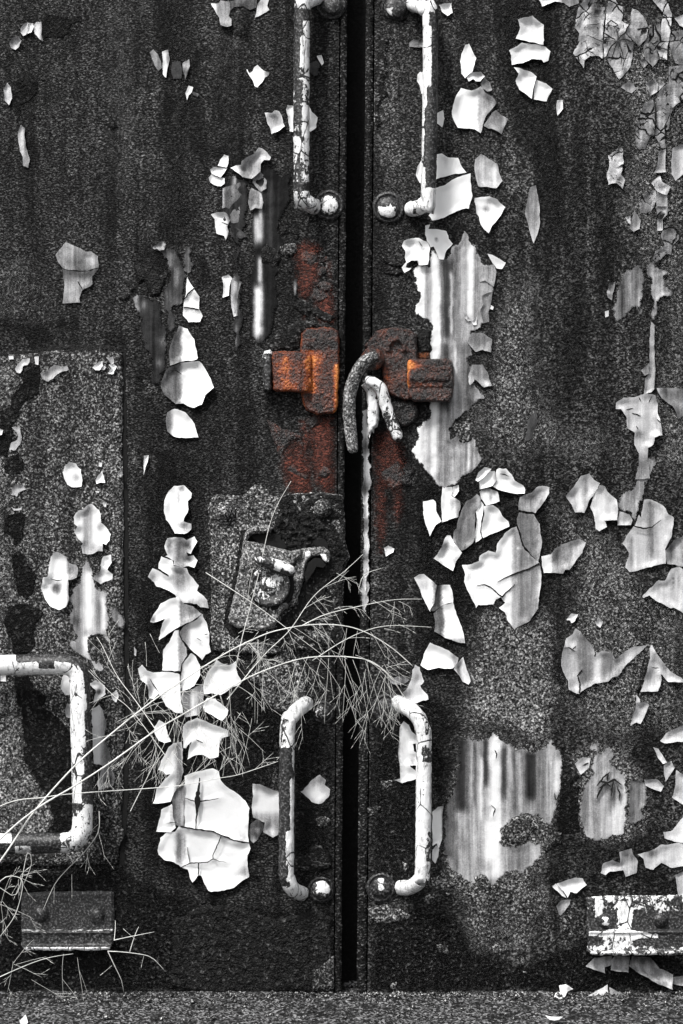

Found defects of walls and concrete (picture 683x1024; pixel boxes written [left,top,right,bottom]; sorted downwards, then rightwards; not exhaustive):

crack [584,20,633,70]
rust [261,241,336,350]
rust [417,330,431,358]
rust [267,415,333,493]
rust [377,433,414,536]
spalling [0,356,125,790]
peeling [423,467,586,629]
crack [477,563,540,598]
peeling [566,473,683,613]
peeling [134,485,279,892]
crack [181,778,249,875]
peeling [432,726,683,895]